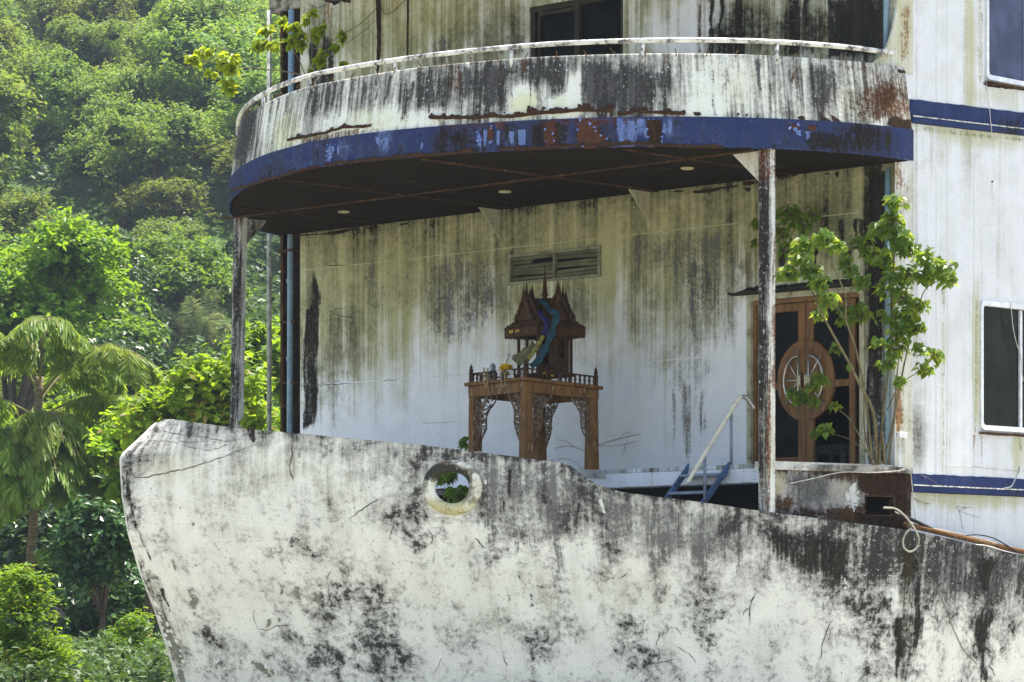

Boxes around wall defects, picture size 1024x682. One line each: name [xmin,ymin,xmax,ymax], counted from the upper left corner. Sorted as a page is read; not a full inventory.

leakage [307,36,392,125]
peeling [475,125,526,148]
peeling [544,121,555,147]
corrosion [428,103,701,121]
peeling [576,118,672,147]
corrosion [864,69,912,129]
leakage [836,171,885,464]
leakage [302,273,356,430]
crack [129,430,255,478]
corrosion [827,474,907,529]
leakage [767,525,851,590]
leakage [879,545,1022,682]